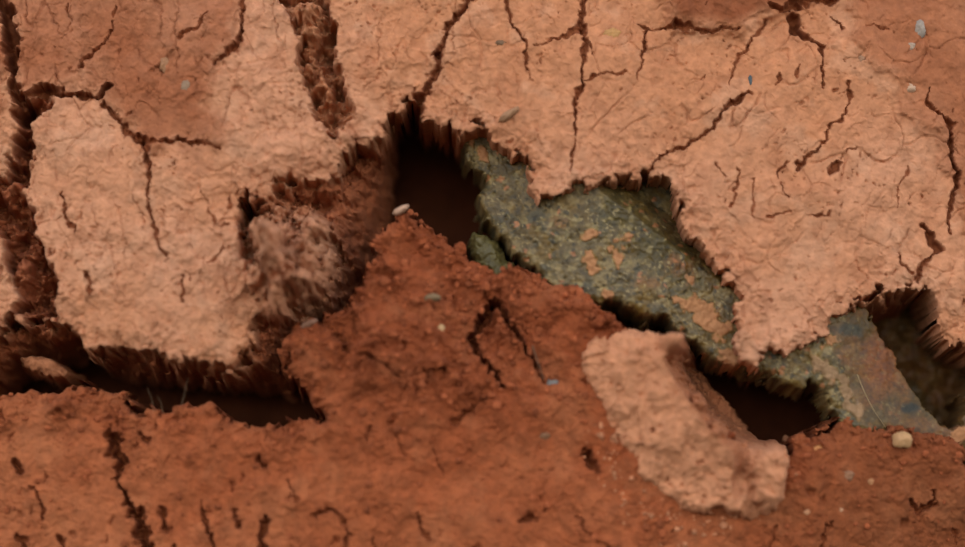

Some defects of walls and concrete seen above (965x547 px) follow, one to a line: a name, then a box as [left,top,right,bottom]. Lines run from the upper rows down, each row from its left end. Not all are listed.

crack [406,0,475,140]
crack [503,0,891,219]
crack [0,0,222,303]
crack [200,190,234,263]
spalling [0,0,965,429]
crack [102,424,177,547]
spalling [135,431,152,447]
crack [200,499,272,547]
crack [286,478,377,547]
crack [414,511,432,542]
hole [580,446,603,476]
spalling [781,416,842,457]